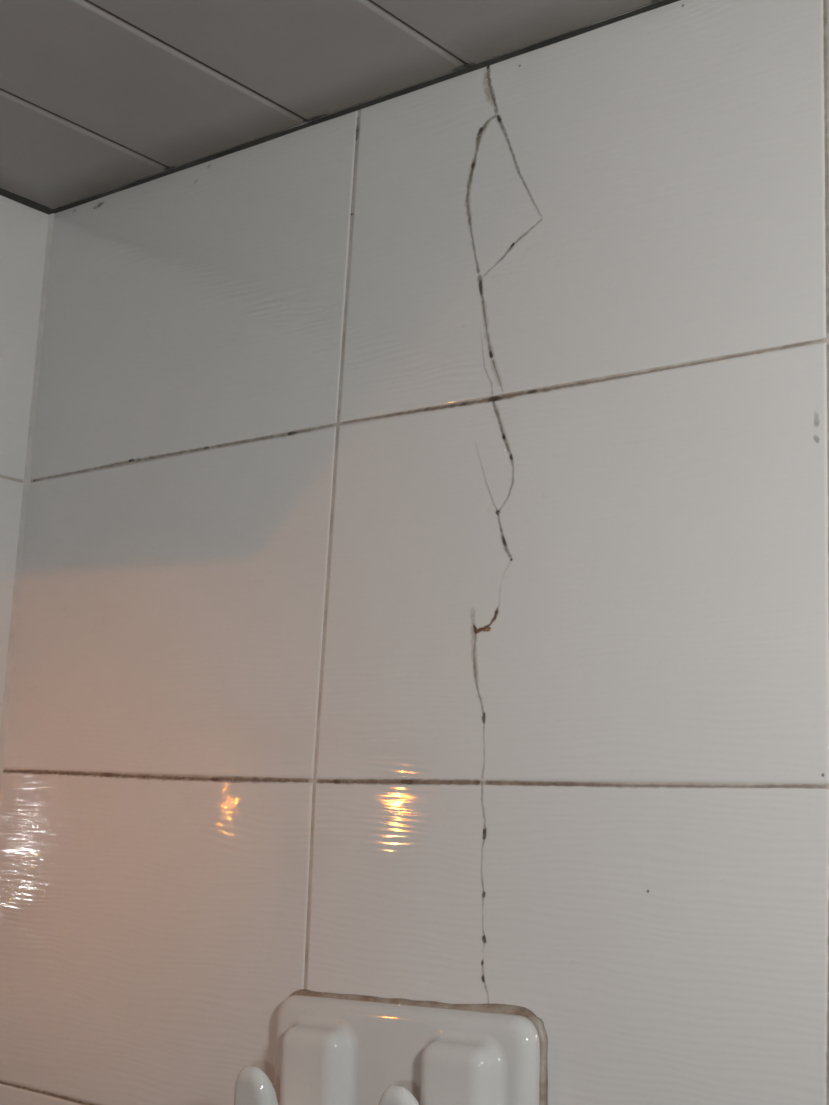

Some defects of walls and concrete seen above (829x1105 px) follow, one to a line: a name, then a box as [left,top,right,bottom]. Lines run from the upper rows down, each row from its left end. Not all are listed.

crack [470,66,512,179]